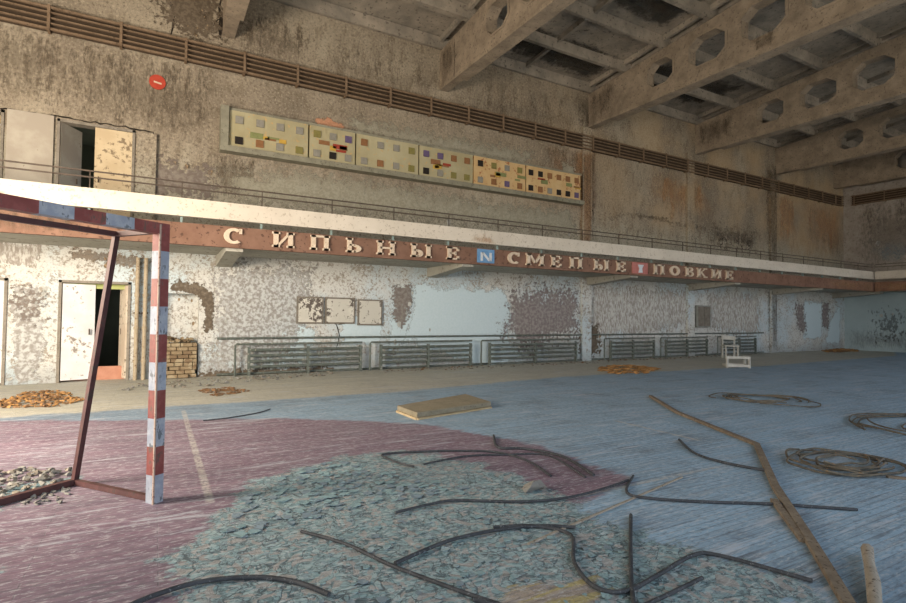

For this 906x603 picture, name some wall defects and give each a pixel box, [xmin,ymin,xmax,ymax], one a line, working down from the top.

peeling [7,284,51,384]
peeling [170,258,337,377]
peeling [339,278,686,365]